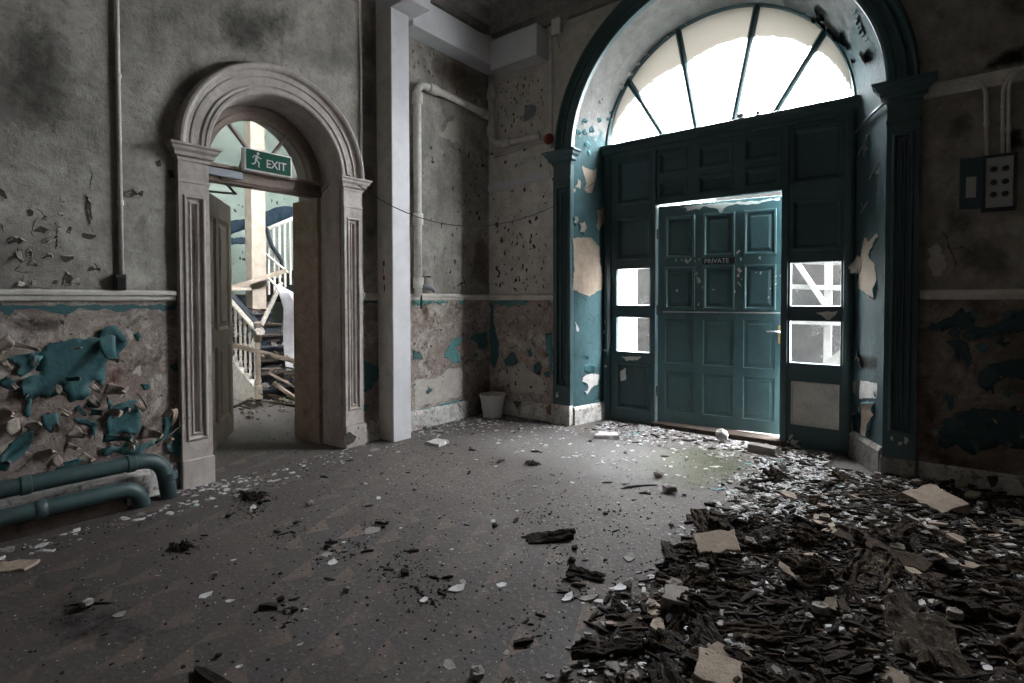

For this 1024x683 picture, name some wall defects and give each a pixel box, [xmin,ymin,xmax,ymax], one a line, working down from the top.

peeling [794,8,867,65]
flaking render [573,98,613,193]
peeling [7,194,101,286]
flaking render [413,146,558,415]
flaking render [572,207,604,297]
flaking render [848,233,879,300]
peeling [0,303,181,471]
flaking render [851,349,877,437]
peeling [934,307,1024,391]
peeling [938,397,1024,455]